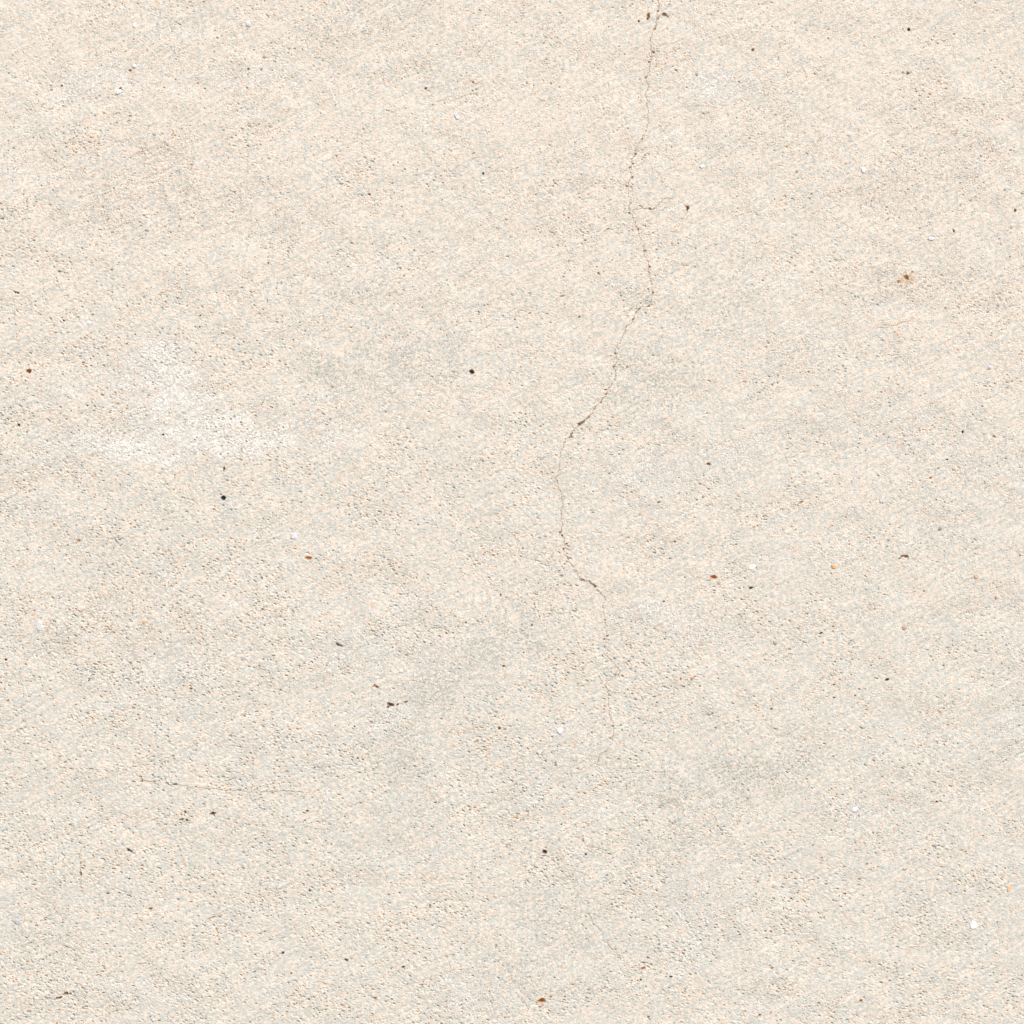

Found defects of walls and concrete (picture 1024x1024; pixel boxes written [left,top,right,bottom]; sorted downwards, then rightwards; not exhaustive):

crack [556,0,672,760]